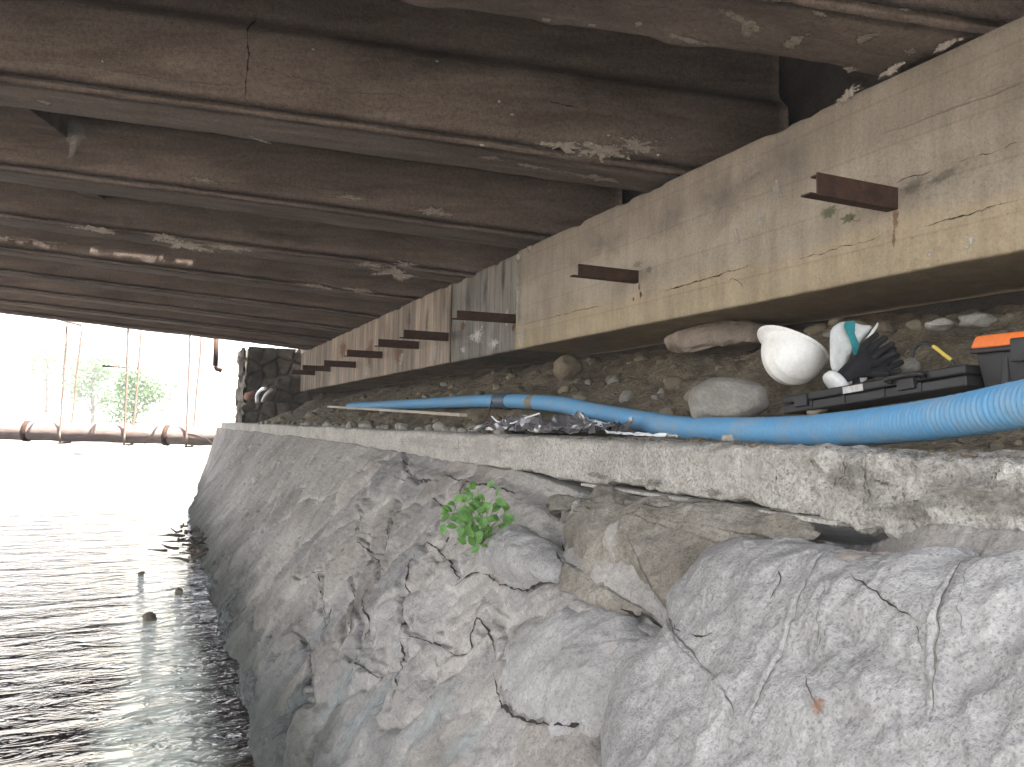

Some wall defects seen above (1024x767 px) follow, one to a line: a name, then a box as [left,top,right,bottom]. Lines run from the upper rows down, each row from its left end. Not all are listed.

crack [3,14,415,101]
spalling [879,47,919,78]
spalling [933,38,963,54]
spalling [832,85,861,106]
spalling [519,135,661,162]
crack [928,199,1021,226]
spalling [65,224,120,235]
spalling [151,232,255,254]
crack [672,265,749,289]
crack [300,456,580,754]
crack [620,551,829,724]
crack [852,557,973,714]